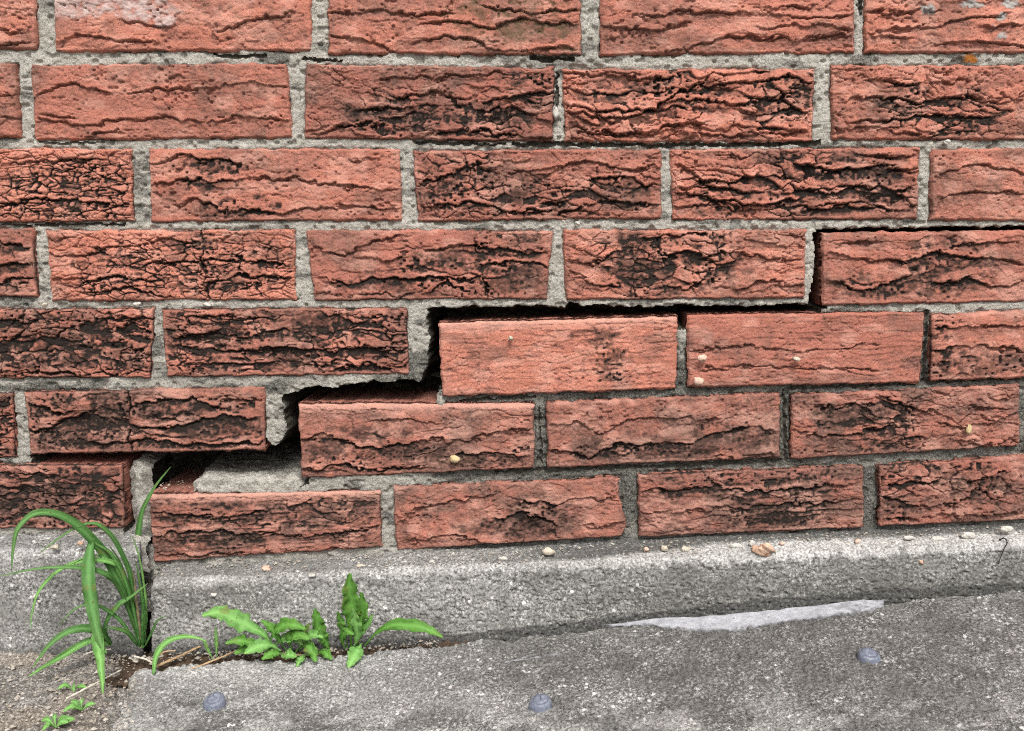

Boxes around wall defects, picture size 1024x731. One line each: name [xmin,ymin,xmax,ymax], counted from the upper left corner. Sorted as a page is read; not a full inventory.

crack [816,225,1024,233]
crack [152,294,1020,489]
crack [30,453,59,464]
spalling [193,448,306,493]
crack [123,519,153,545]
crack [145,612,153,651]